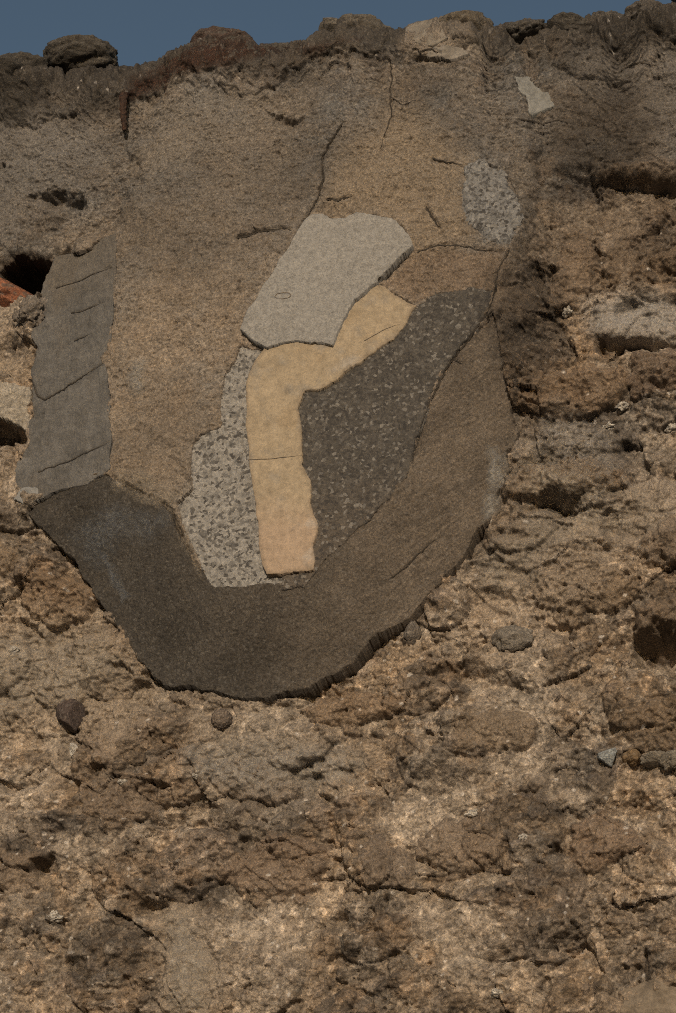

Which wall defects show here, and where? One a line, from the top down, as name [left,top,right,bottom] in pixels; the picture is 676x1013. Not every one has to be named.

crack [237,122,352,238]